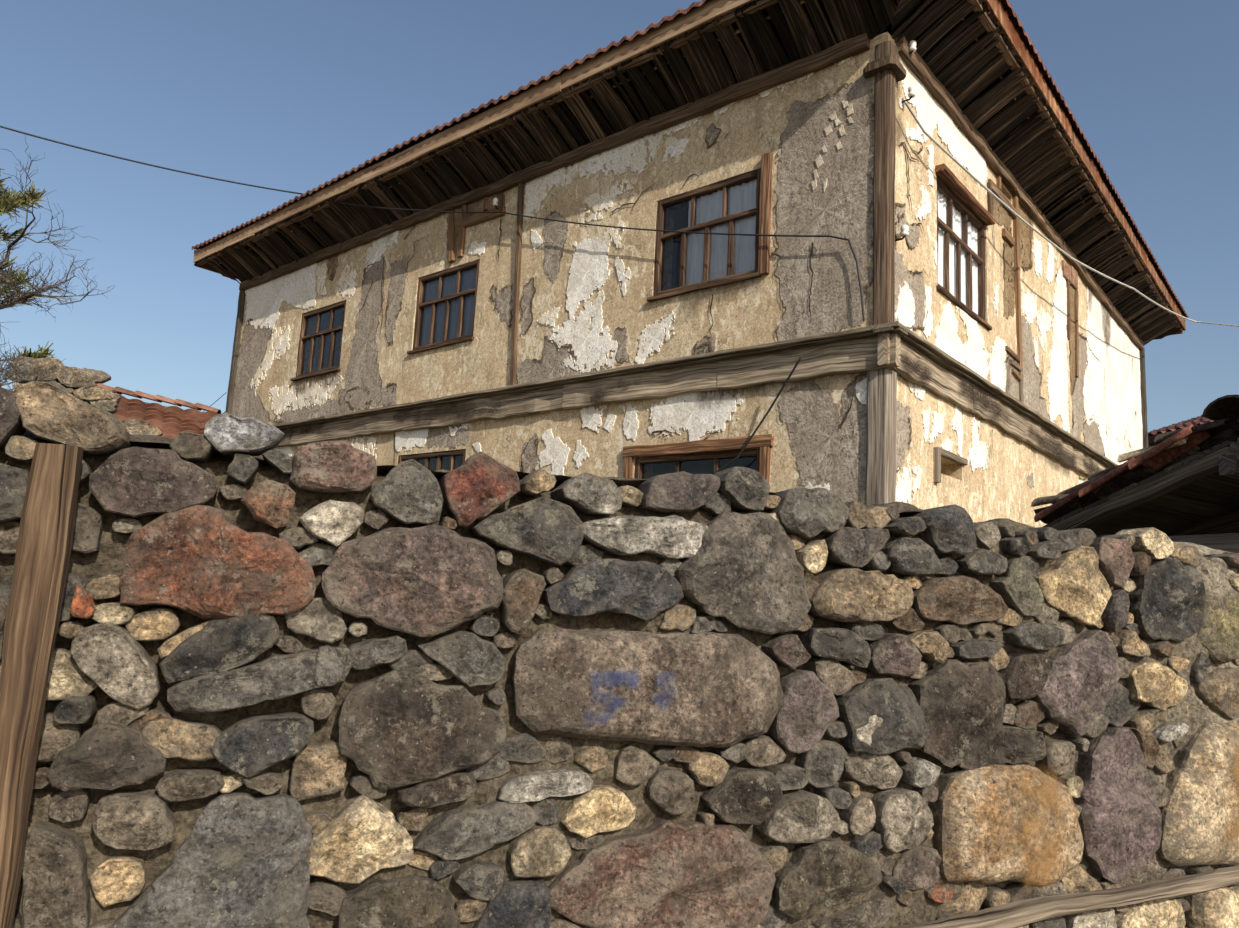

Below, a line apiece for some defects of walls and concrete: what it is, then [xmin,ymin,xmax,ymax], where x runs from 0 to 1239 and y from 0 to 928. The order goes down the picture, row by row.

peeling [758,72,814,98]
peeling [489,102,734,384]
spalling [771,76,874,341]
peeling [894,54,1143,465]
spalling [232,231,409,424]
peeling [341,436,377,458]
spalling [395,423,481,452]
peeling [520,391,743,476]
spalling [777,373,867,503]